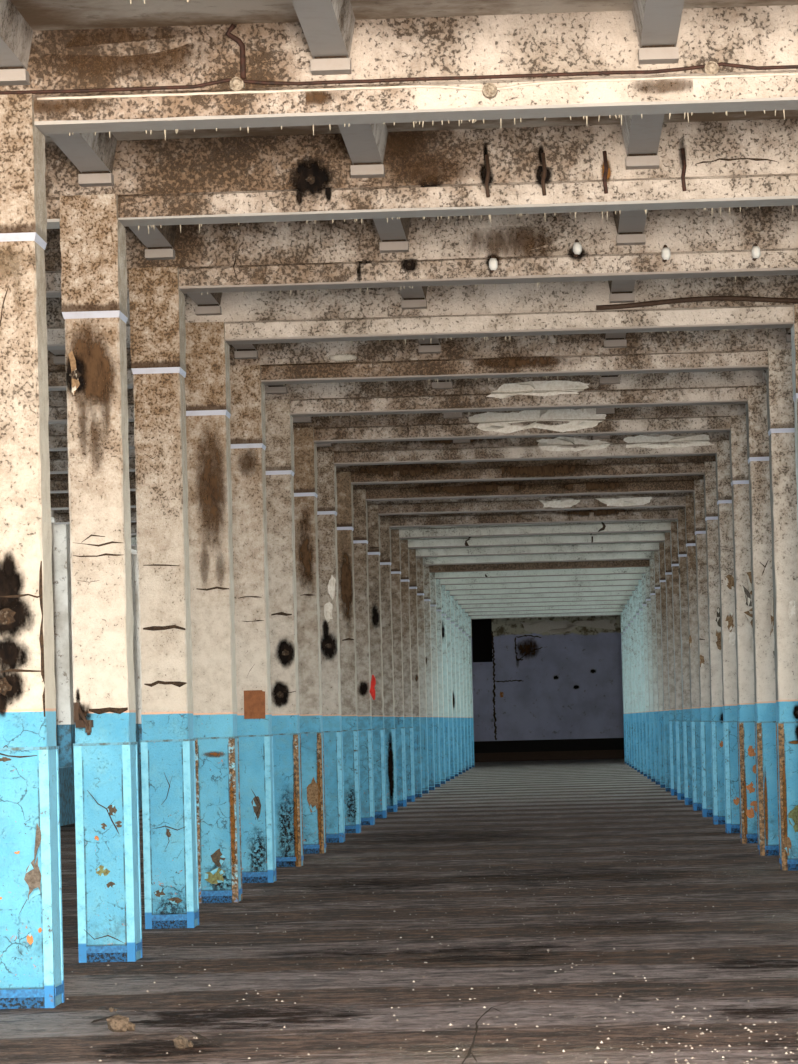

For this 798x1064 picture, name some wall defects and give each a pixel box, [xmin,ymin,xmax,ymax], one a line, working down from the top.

damp [72,329,115,463]
peeling [486,380,589,399]
peeling [469,408,714,452]
crack [73,534,179,582]
crack [196,587,313,622]
crack [0,561,45,717]
crack [143,624,186,632]
crack [144,679,187,687]
crack [89,706,128,714]
crack [0,745,37,758]
peeling [784,805,798,856]
peeling [24,824,41,901]